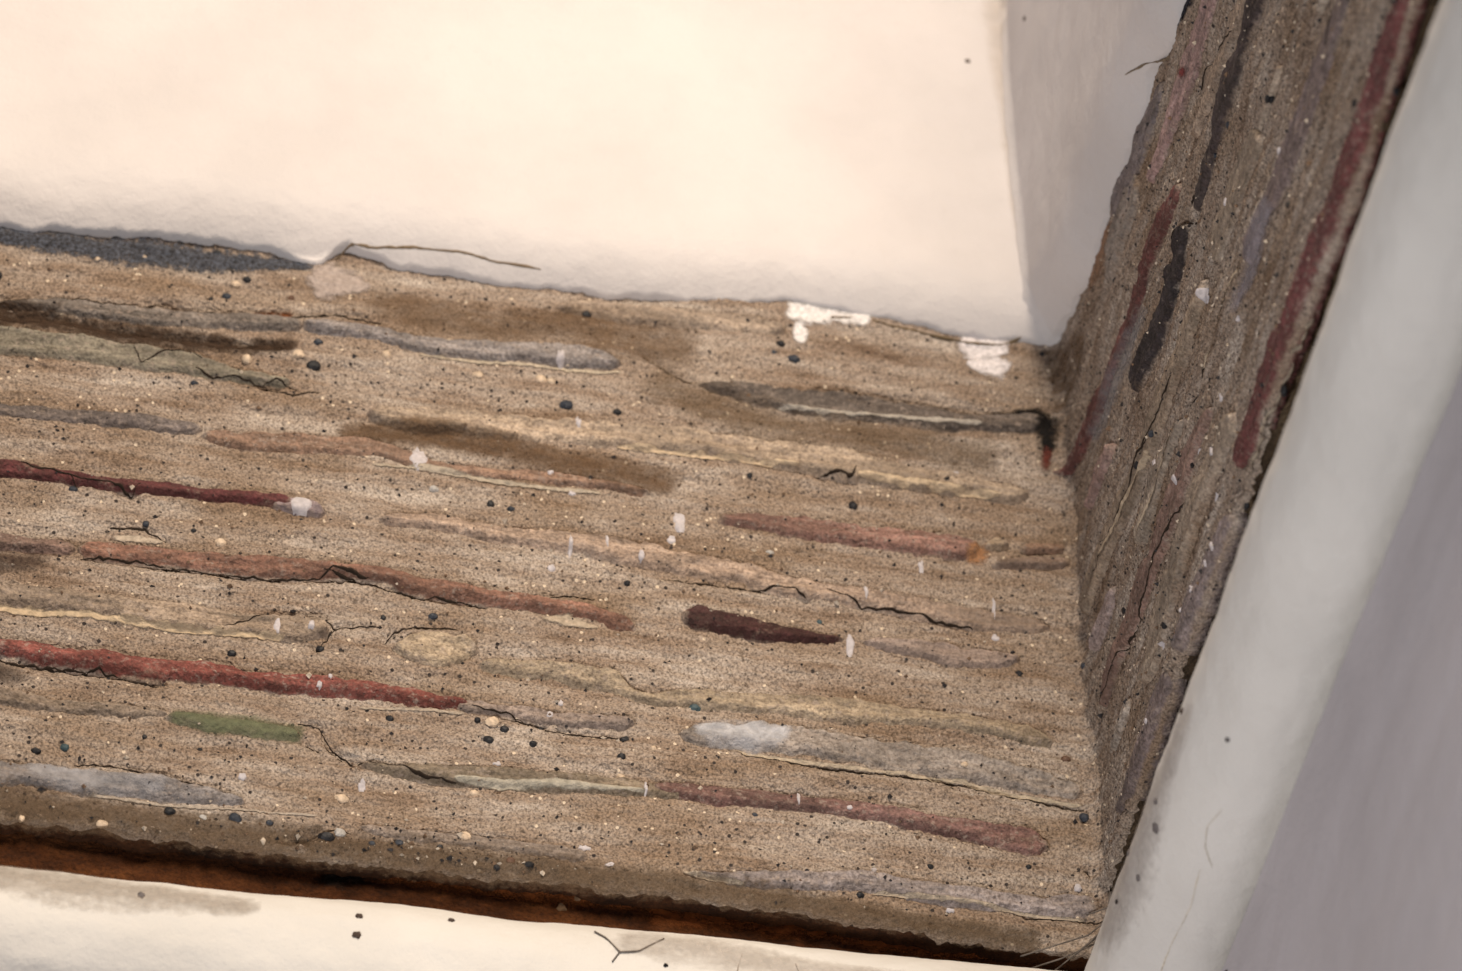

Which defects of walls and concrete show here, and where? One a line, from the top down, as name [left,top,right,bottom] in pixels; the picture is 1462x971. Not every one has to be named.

crack [336,243,541,270]
spalling [307,262,370,299]
leakage [32,766,317,816]
leakage [455,775,645,793]